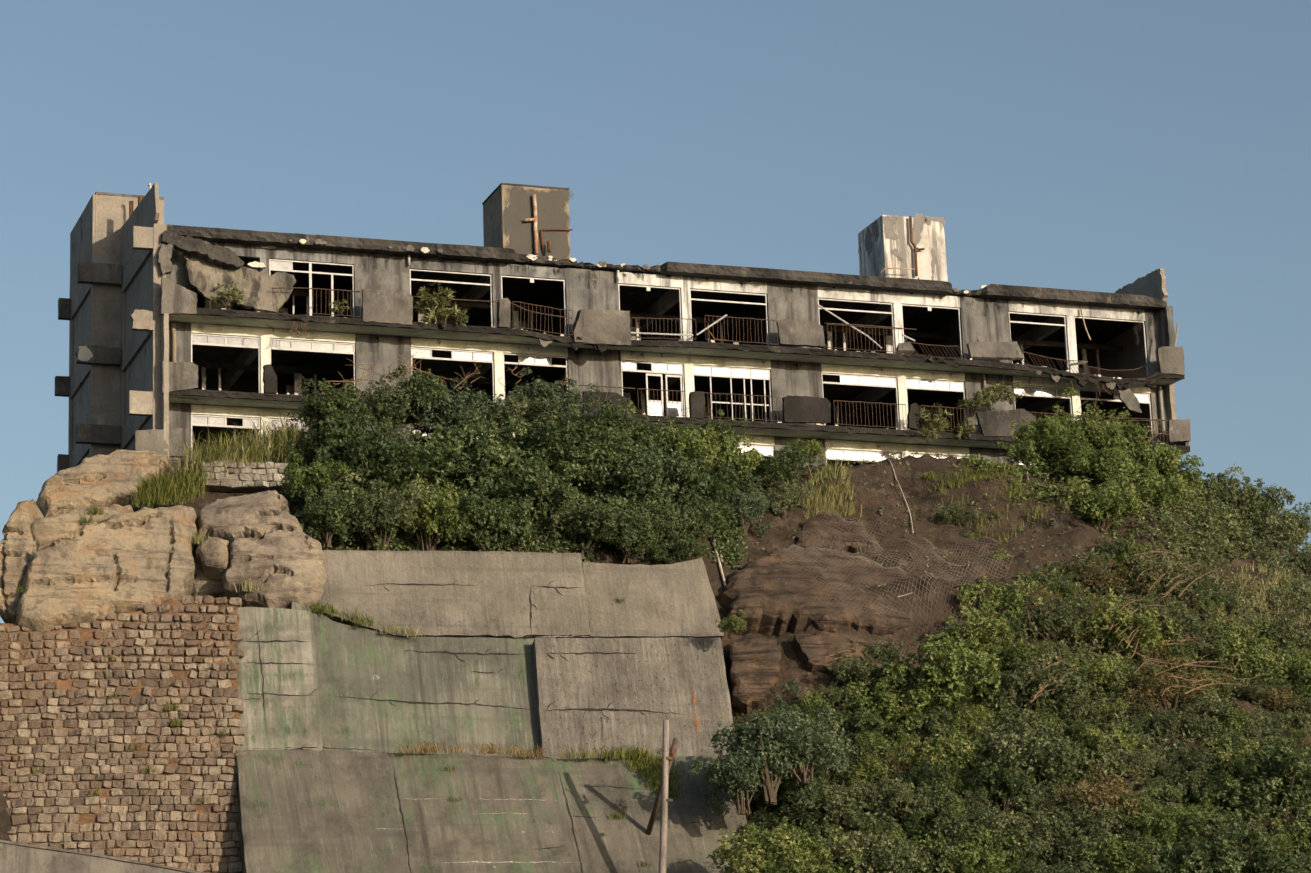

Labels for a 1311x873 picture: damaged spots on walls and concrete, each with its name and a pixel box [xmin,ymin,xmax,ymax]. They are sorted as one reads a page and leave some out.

spalling [260,239,327,249]